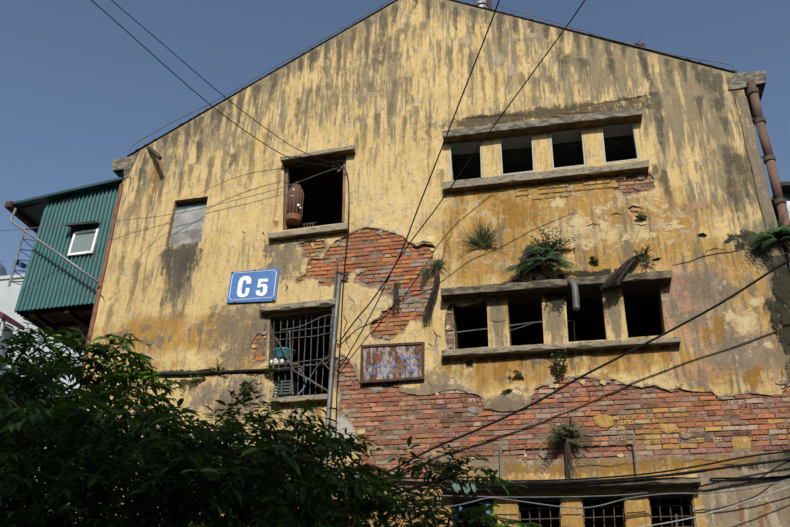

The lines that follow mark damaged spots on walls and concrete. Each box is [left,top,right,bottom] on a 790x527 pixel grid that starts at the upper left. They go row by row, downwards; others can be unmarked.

leakage [270,5,398,96]
leakage [162,84,260,161]
leakage [442,51,664,143]
leakage [665,58,740,132]
spalling [515,172,685,250]
leakage [159,242,202,308]
spalling [249,318,268,362]
spalling [296,227,435,340]
spalling [444,303,454,349]
peeling [722,296,764,352]
leakage [724,229,790,373]
spalling [334,339,790,492]